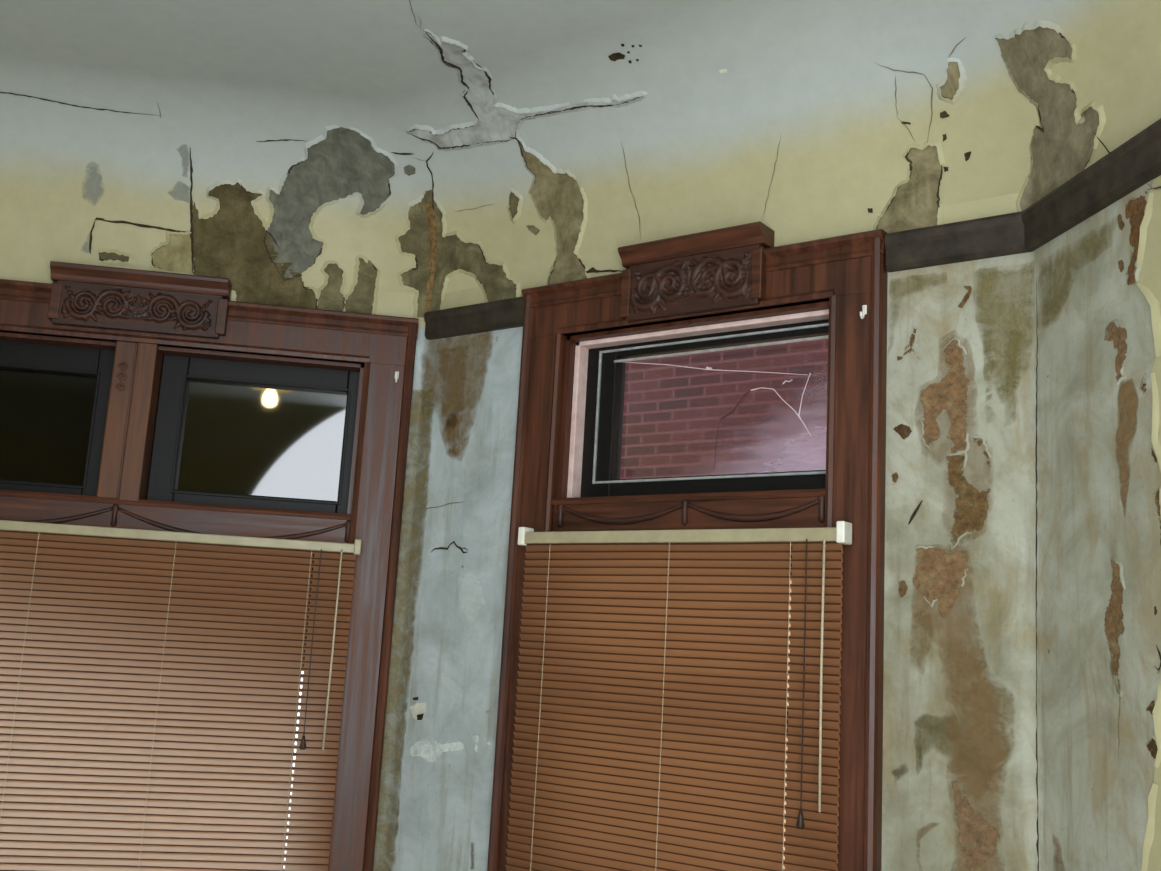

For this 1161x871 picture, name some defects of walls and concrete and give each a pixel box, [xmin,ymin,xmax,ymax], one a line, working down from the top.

crack [0,92,161,117]
peeling [149,125,416,315]
peeling [395,189,521,322]
peeling [405,29,648,285]
peeling [867,134,948,233]
leakage [977,229,1106,396]
peeling [994,20,1106,212]
spalling [1117,191,1161,357]
spalling [893,337,992,617]
leakage [373,332,491,871]
spalling [1104,557,1126,698]
leakage [915,650,1010,795]